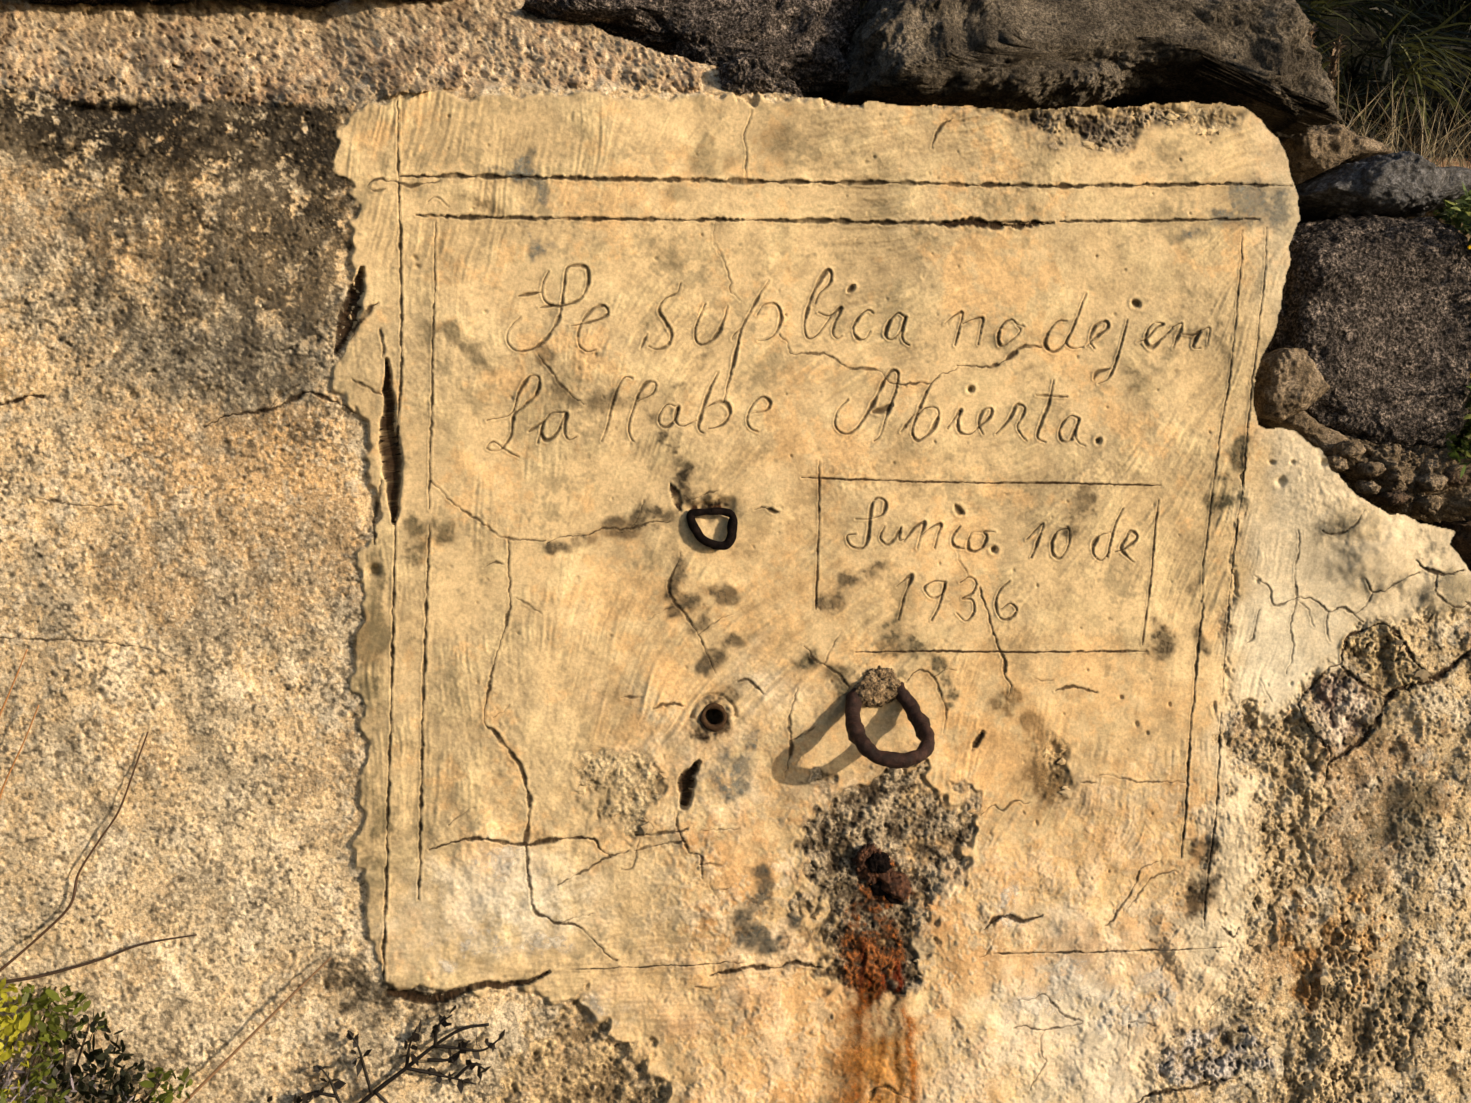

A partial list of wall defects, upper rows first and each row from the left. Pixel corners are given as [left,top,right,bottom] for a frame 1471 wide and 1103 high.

crack [0,395,45,405]
crack [205,269,729,961]
crack [667,561,848,766]
crack [1246,510,1471,787]
crack [388,971,549,1003]
corrosion [834,843,918,1103]
spalling [788,751,983,998]
spalling [1156,625,1460,1103]